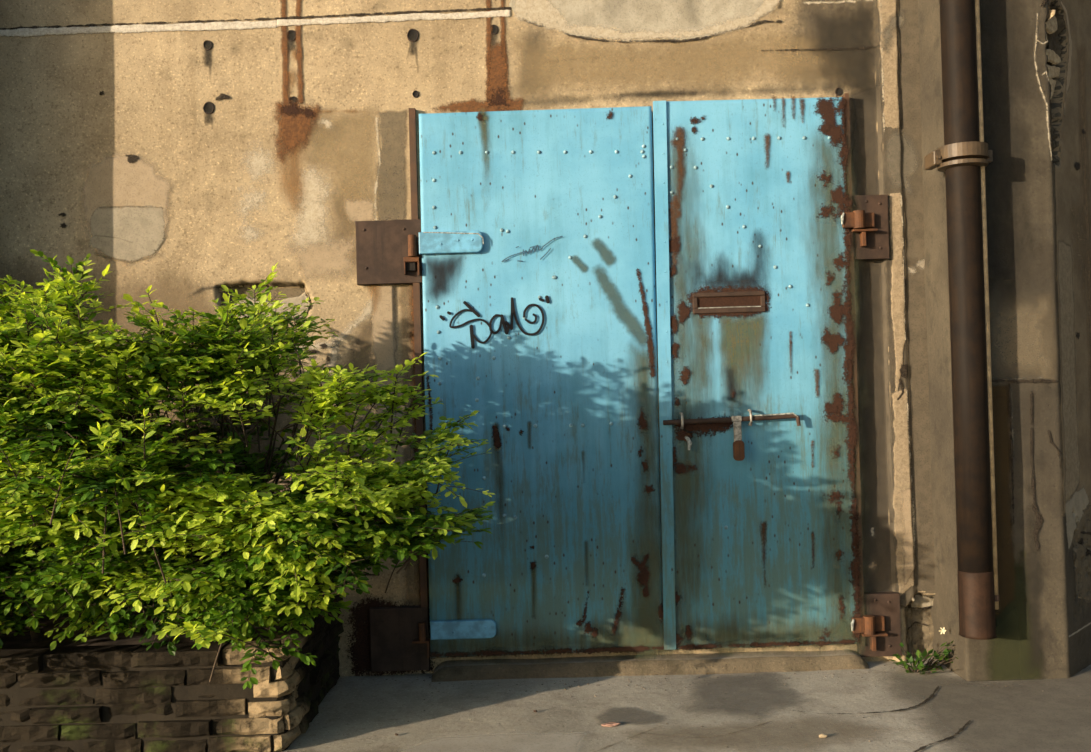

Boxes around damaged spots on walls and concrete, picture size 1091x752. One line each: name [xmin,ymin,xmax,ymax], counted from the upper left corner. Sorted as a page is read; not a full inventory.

rust [275,0,329,201]
rust [433,0,523,162]
spalling [1045,1,1073,163]
rust [669,115,706,278]
spalling [197,283,312,319]
rust [636,269,655,377]
rust [670,285,770,385]
rust [772,95,862,619]
spalling [1065,486,1091,603]
rust [341,552,862,676]
crack [793,686,939,714]
crack [914,720,971,752]